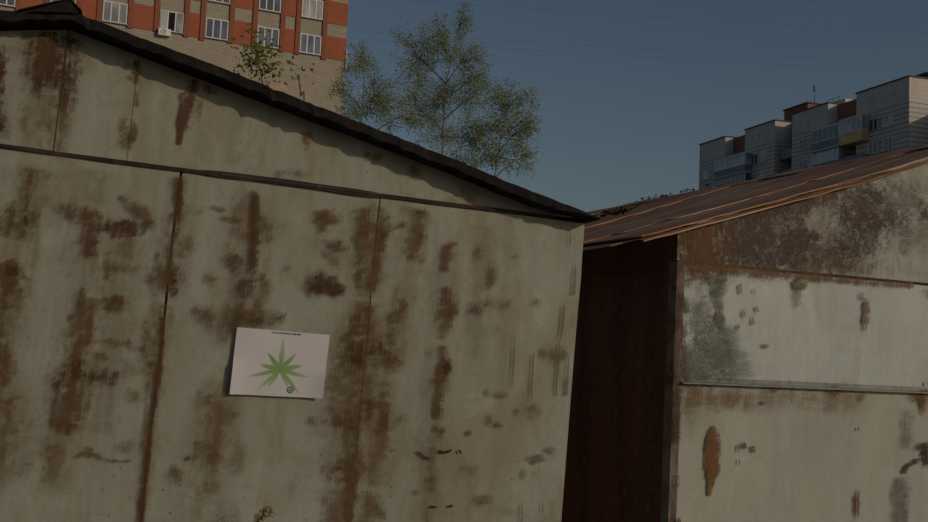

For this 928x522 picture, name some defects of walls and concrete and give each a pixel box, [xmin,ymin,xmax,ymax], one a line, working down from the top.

corrosion [23,31,81,112]
corrosion [176,79,216,145]
corrosion [59,196,155,258]
corrosion [193,190,287,332]
corrosion [0,259,31,480]
corrosion [49,288,126,435]
corrosion [128,175,189,522]
corrosion [307,206,429,522]
corrosion [432,286,482,437]
corrosion [673,293,686,444]
corrosion [705,426,721,496]
corrosion [902,442,928,474]